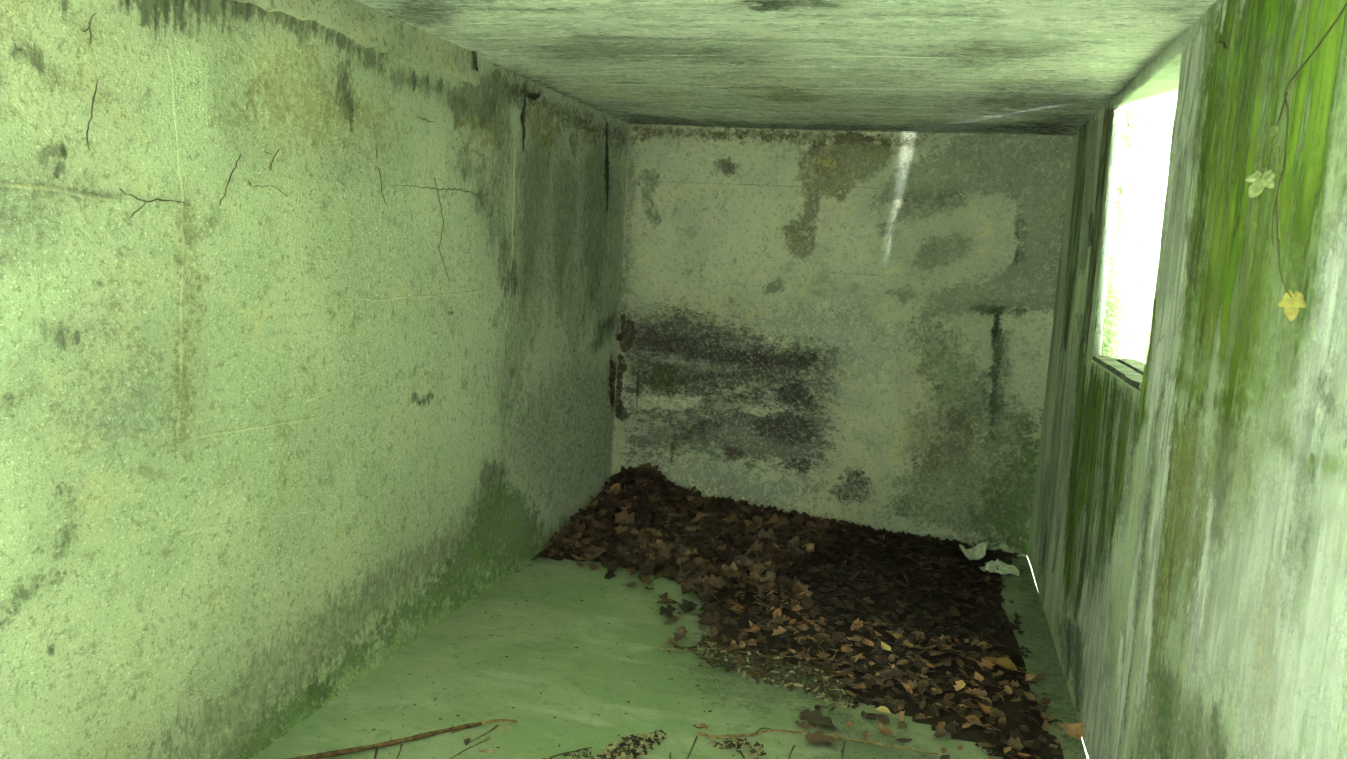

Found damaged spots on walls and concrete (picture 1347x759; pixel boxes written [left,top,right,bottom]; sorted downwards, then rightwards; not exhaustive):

crack [81,13,96,45]
leakage [126,0,384,132]
crack [86,78,99,151]
crack [119,149,288,219]
crack [376,145,495,282]
crack [605,123,1007,211]
leakage [384,0,1347,759]
leakage [237,681,329,759]